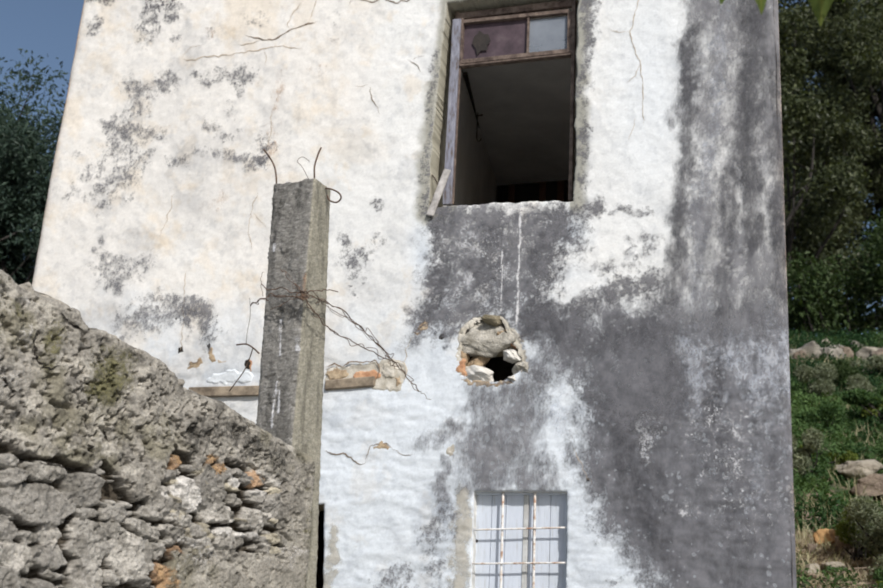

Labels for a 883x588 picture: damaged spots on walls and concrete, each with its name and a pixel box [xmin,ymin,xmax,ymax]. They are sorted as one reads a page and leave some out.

leakage [137,0,179,41]
crack [184,1,319,63]
leakage [191,66,254,97]
crack [611,0,645,136]
leakage [80,70,180,208]
leakage [203,138,274,171]
leakage [90,238,149,295]
leakage [117,290,222,351]
spalling [325,358,408,392]
spalling [455,314,529,387]
leakage [405,0,797,588]
crack [328,443,415,465]